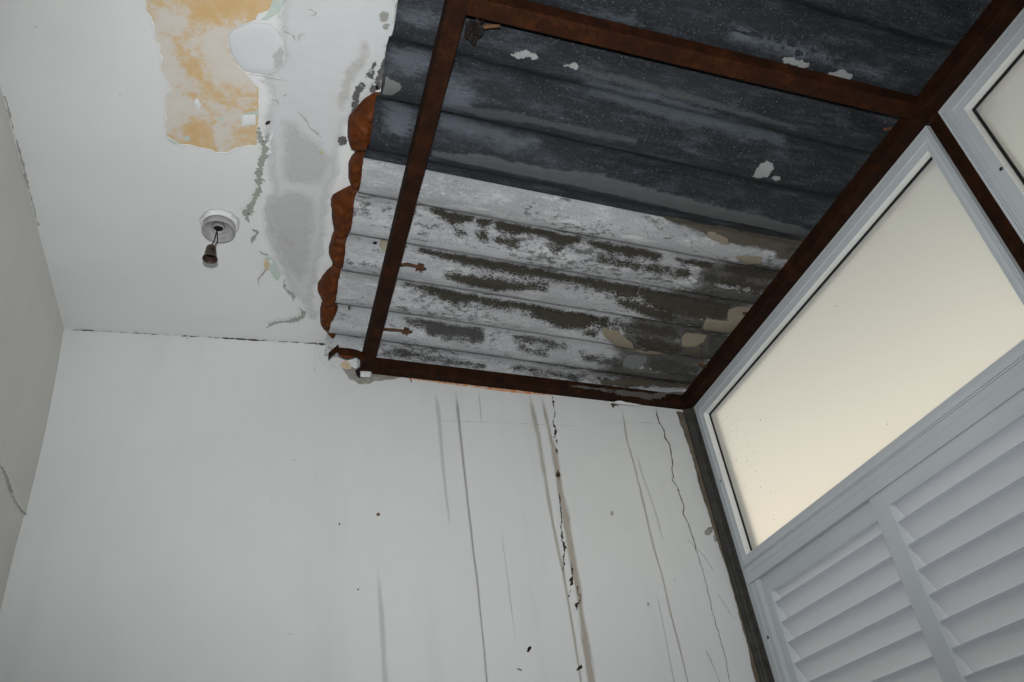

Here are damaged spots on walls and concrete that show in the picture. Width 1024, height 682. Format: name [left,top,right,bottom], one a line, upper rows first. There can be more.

peeling [144,0,284,153]
crack [75,127,325,345]
mould [381,348,486,369]
corrosion [409,378,553,396]
mould [403,248,730,382]
mould [429,207,777,295]
crack [0,466,27,515]
leakage [457,405,487,681]
crack [467,397,581,610]
leakage [531,406,581,680]
crack [641,411,735,682]